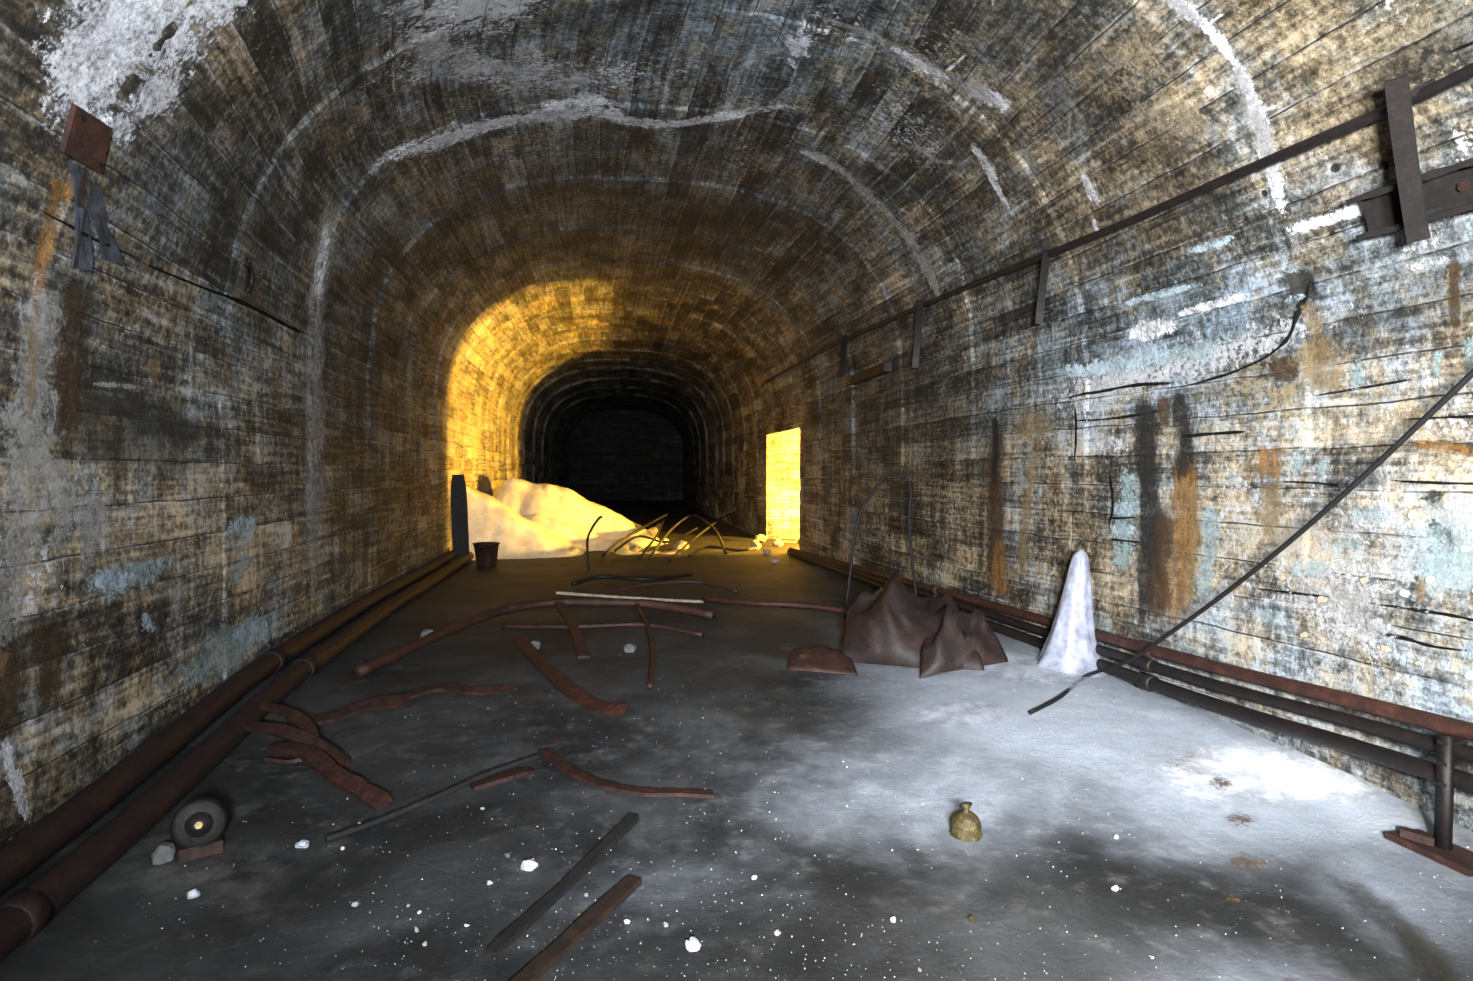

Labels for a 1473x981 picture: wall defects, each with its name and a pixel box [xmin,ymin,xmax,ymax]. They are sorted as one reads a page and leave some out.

leakage [32,0,252,146]
corrosion [1134,389,1200,624]